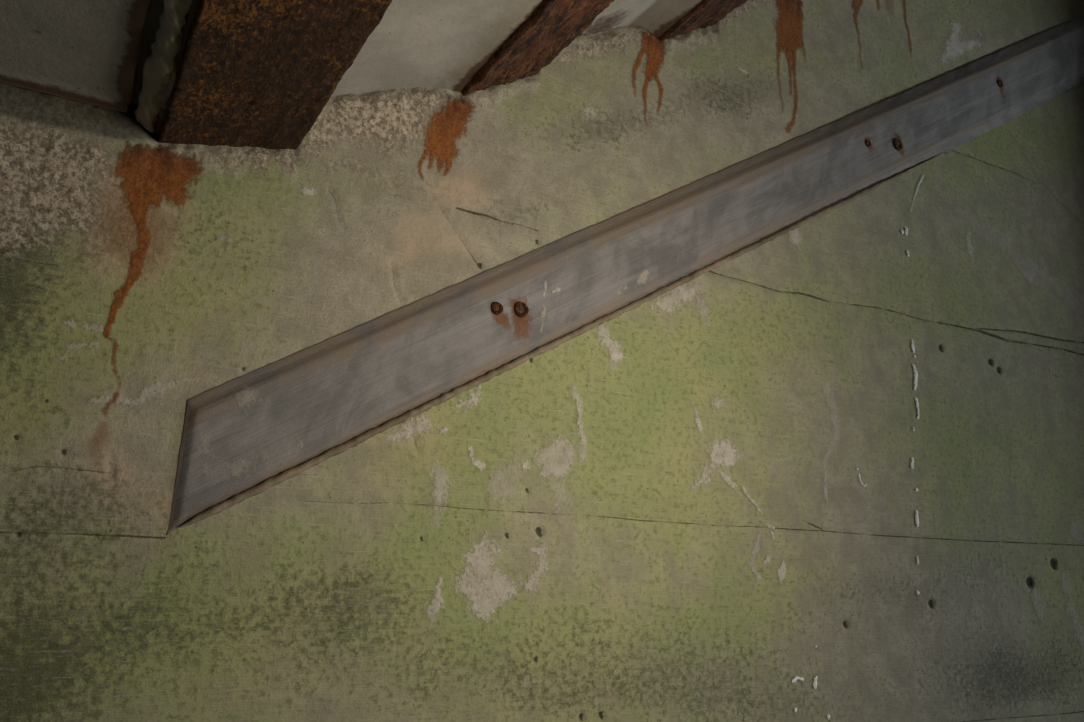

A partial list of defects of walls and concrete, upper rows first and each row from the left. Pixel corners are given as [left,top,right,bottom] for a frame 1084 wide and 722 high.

corrosion [632,32,666,117]
corrosion [774,0,804,132]
corrosion [419,97,475,178]
corrosion [102,142,204,415]
crack [708,270,912,317]
crack [939,322,1084,356]
peeling [522,388,586,479]
peeling [691,437,742,489]
crack [42,531,166,539]
peeling [427,578,444,619]
peeling [455,527,548,623]
crack [599,516,1084,546]